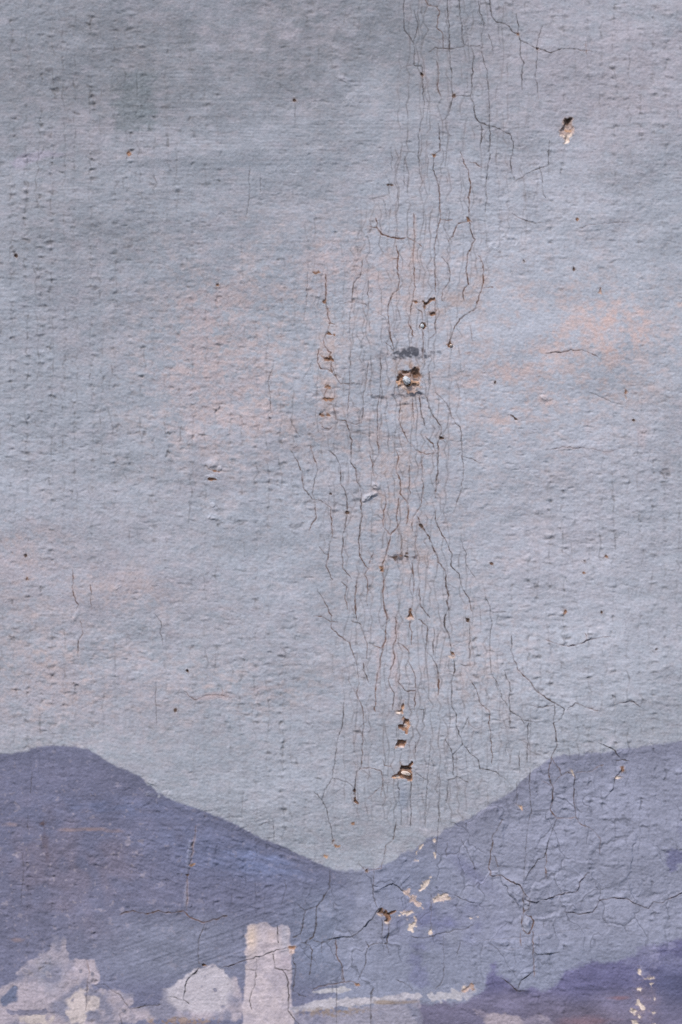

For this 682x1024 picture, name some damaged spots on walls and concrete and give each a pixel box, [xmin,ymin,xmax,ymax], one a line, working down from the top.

hole [557,115,577,145]
hole [394,364,422,388]
crack [222,0,682,1024]
hole [389,698,416,783]
crack [84,824,228,1024]
spalling [374,874,456,937]
peeling [628,965,660,1024]